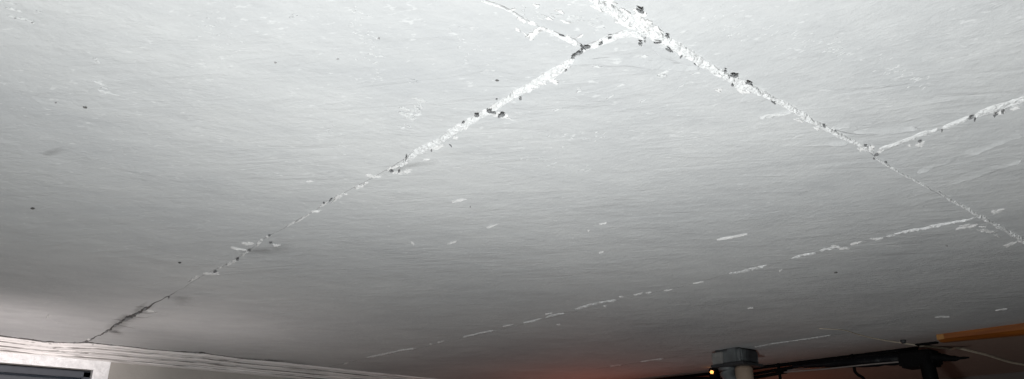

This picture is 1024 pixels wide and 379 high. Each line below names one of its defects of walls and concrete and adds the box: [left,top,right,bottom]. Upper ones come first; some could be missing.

crack [0,292,277,362]
crack [180,0,1024,359]